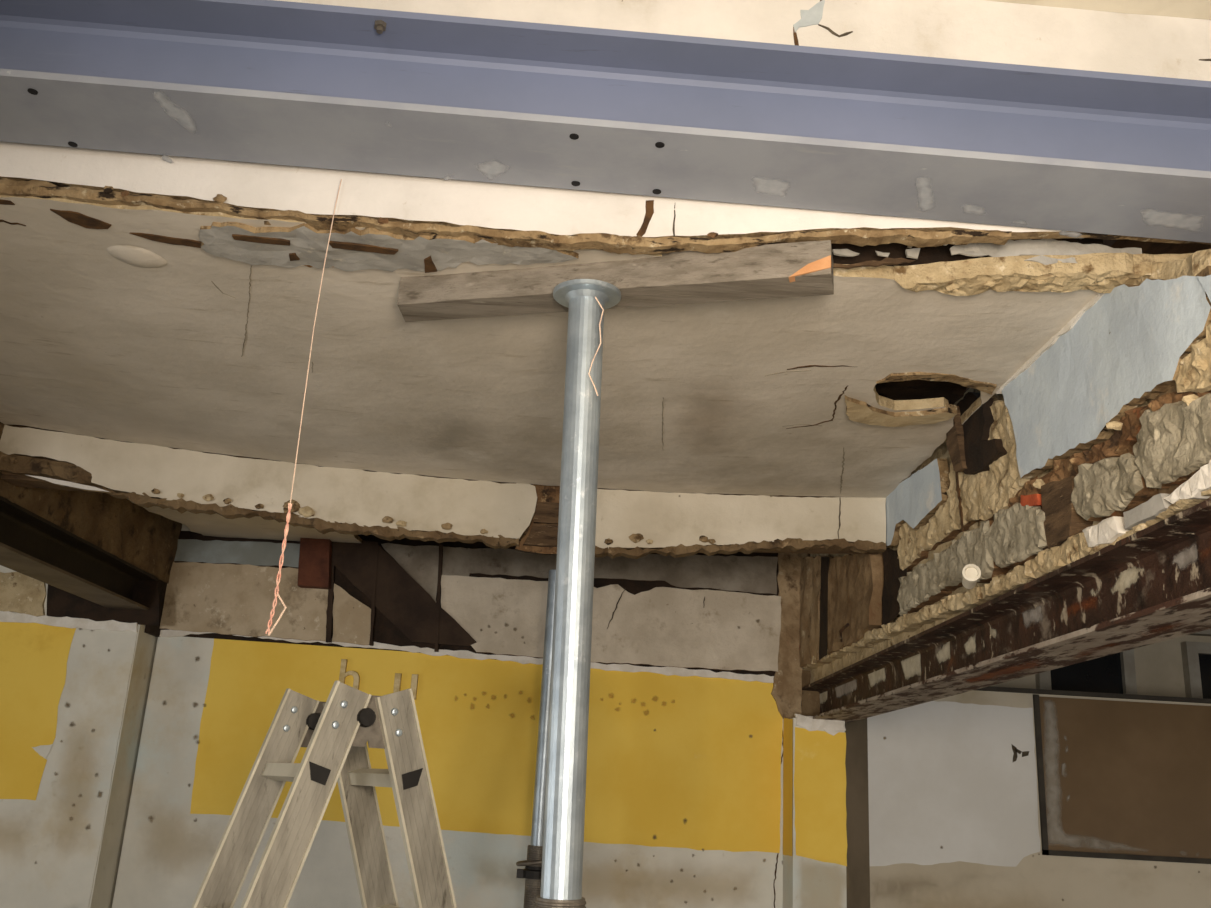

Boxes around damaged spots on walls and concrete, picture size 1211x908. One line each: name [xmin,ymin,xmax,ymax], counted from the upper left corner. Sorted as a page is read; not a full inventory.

peeling [793,0,825,32]
peeling [0,178,1211,572]
crack [765,365,852,429]
crack [837,448,845,539]
peeling [1112,568,1144,594]
peeling [1023,606,1043,626]
peeling [936,637,976,663]
peeling [901,654,921,679]